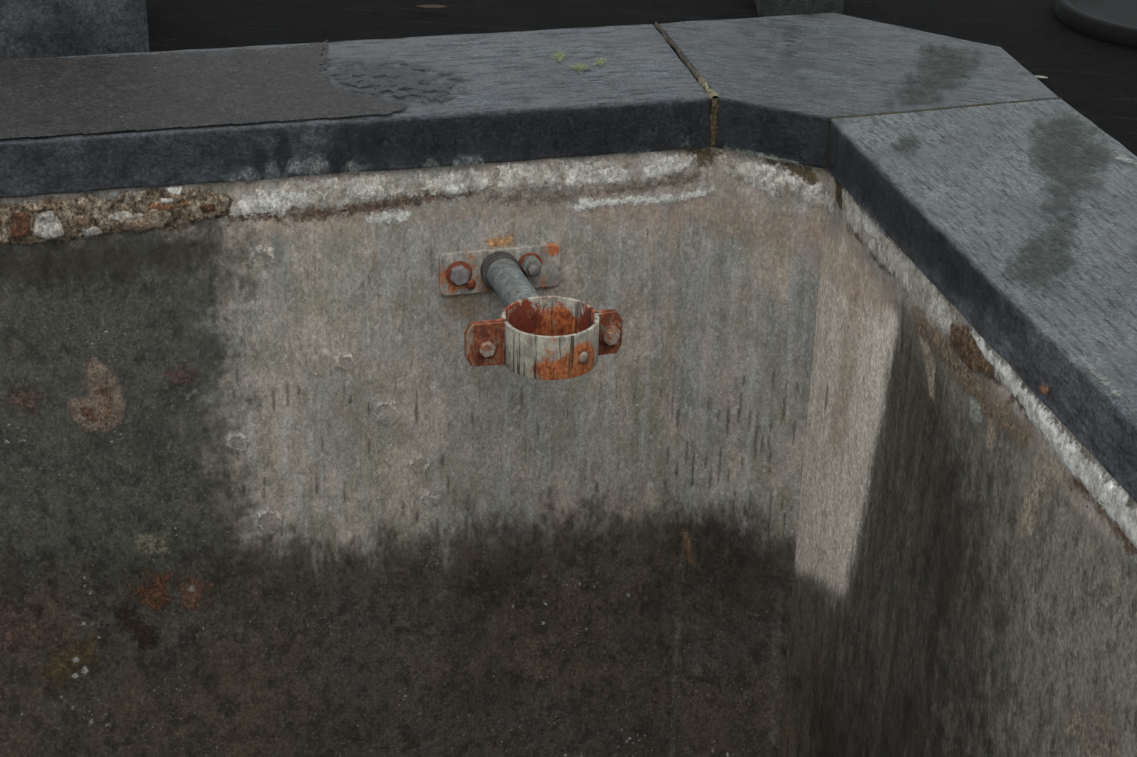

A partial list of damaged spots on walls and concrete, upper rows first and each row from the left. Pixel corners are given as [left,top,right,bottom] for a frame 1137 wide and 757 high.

leakage [0,40,712,182]
peeling [0,151,697,246]
rust [69,360,125,432]
peeling [718,149,1137,548]